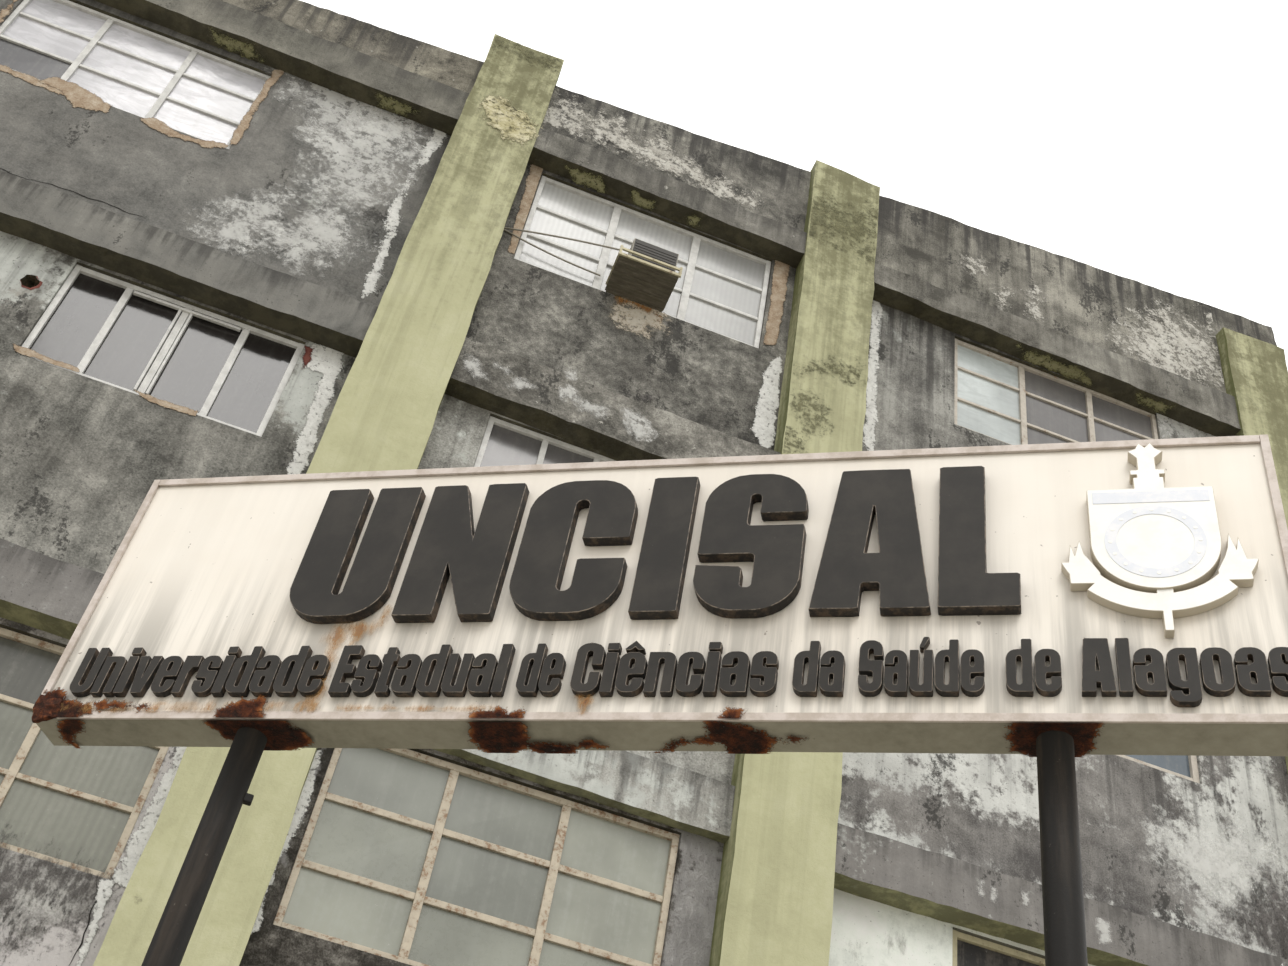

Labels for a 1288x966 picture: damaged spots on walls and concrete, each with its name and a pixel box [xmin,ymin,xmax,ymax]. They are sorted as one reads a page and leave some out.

spalling [0,65,111,113]
spalling [141,70,284,148]
water stain [197,77,424,265]
peeling [477,94,760,208]
spalling [135,390,198,416]
water stain [1214,788,1268,840]
water stain [1215,855,1288,959]